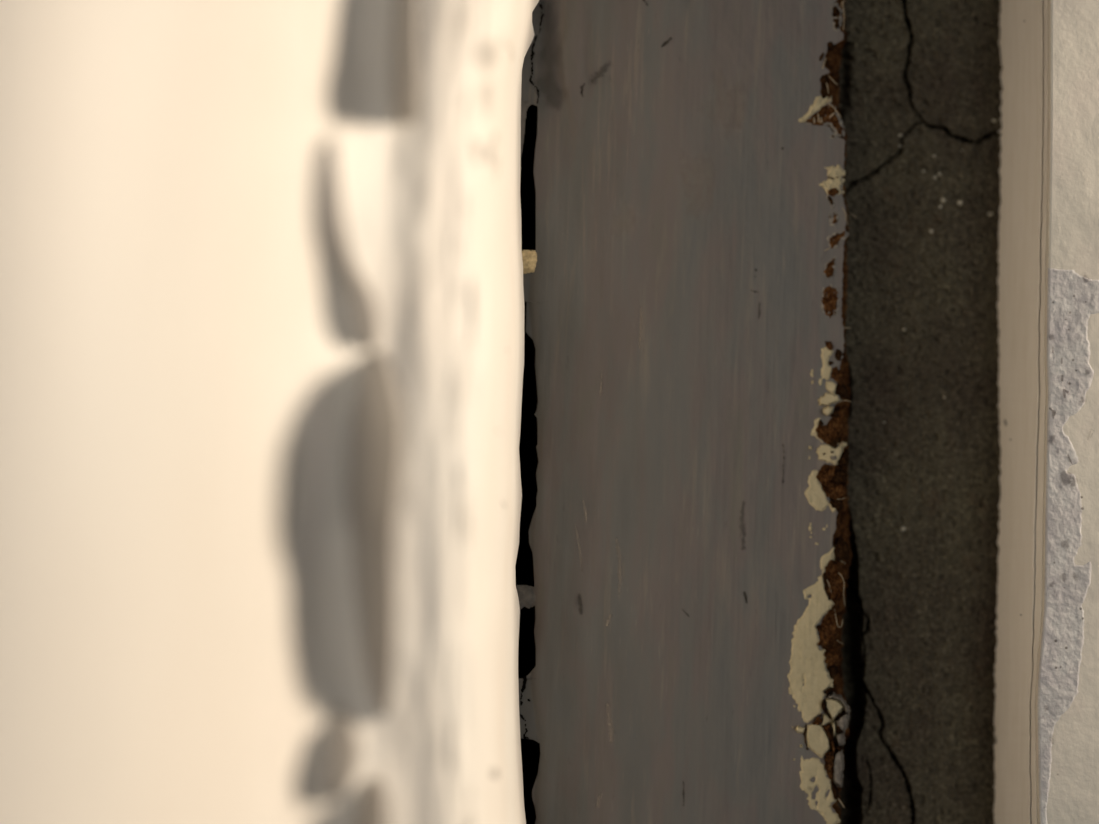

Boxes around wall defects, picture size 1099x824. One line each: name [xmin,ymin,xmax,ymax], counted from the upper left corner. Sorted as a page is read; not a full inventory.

crack [845,0,998,195]
peeling [787,0,852,824]
crack [846,578,916,824]